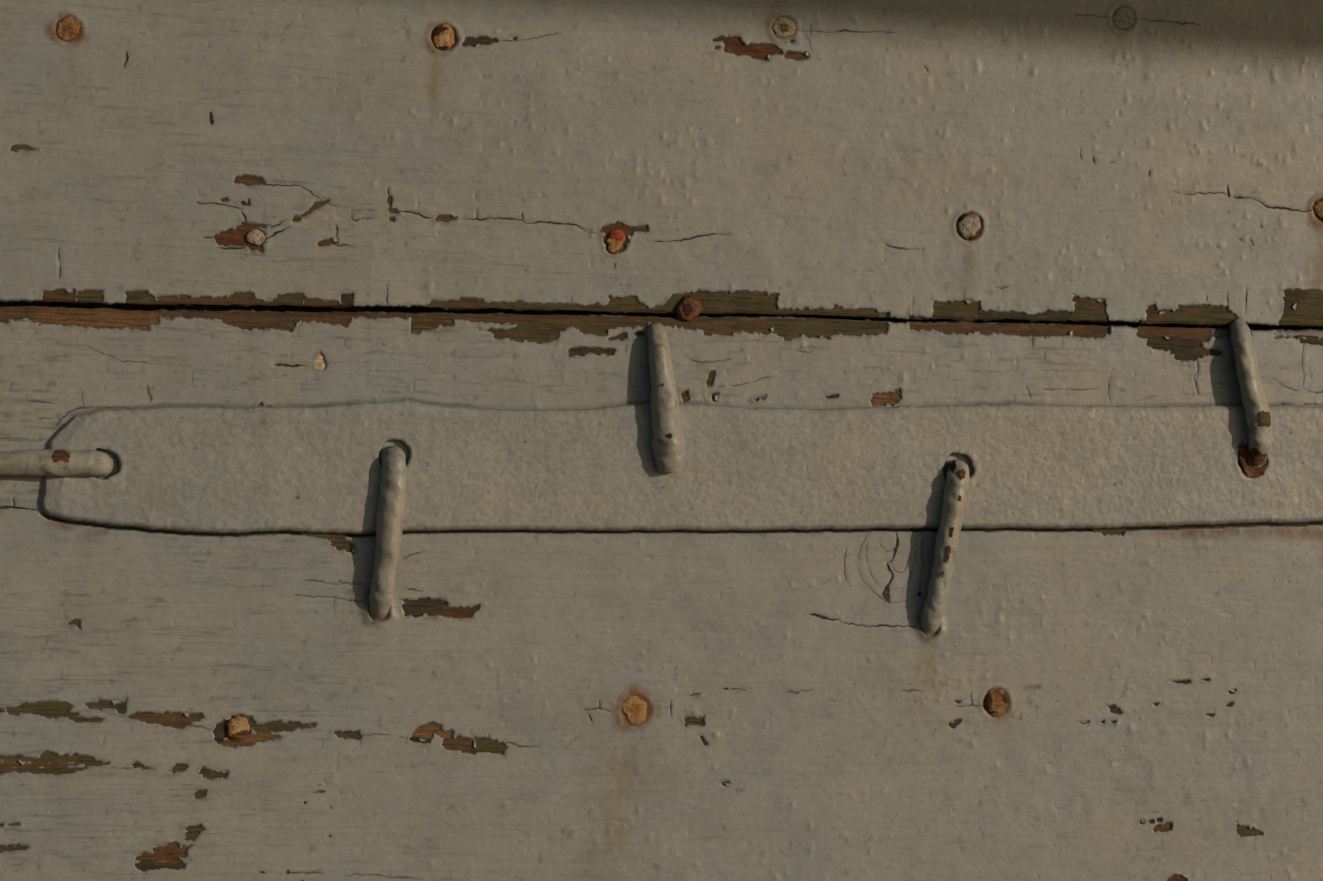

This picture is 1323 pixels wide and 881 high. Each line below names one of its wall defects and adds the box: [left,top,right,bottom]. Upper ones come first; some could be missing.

corrosion [433,26,449,51]
crack [264,184,430,247]
crack [463,213,595,233]
crack [1149,170,1312,249]
peeling [0,288,888,357]
peeling [909,296,1109,339]
peeling [1136,304,1248,361]
corrosion [1239,441,1267,478]
crack [810,530,925,627]
peeling [0,698,316,748]
corrosion [620,689,654,726]
corrosion [985,691,1008,714]